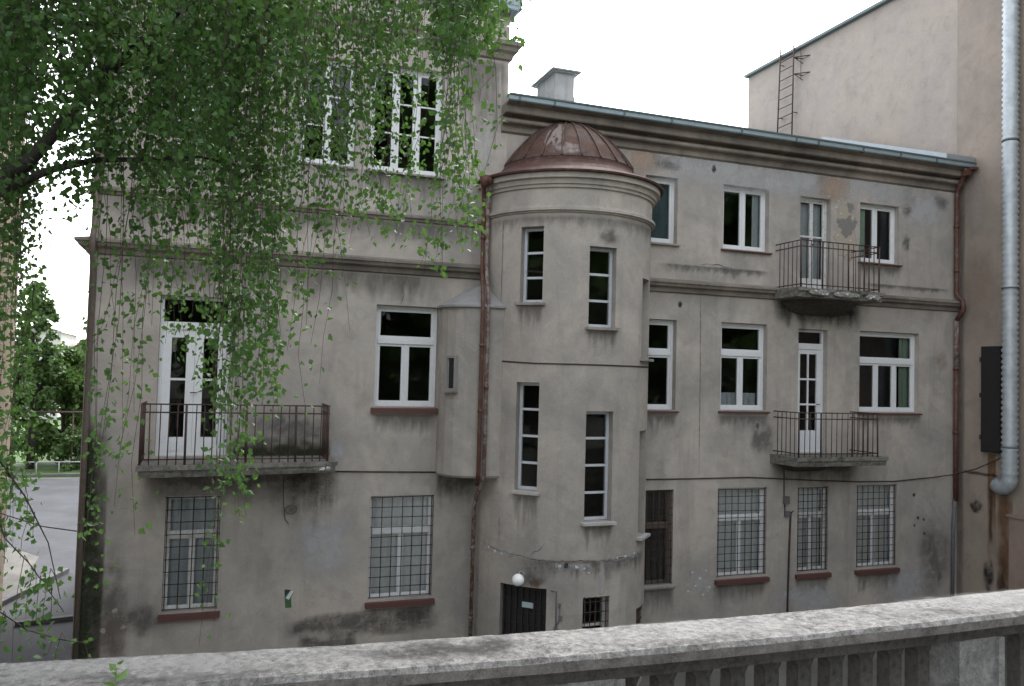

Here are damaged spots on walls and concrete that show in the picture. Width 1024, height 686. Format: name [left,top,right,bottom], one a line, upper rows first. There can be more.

flaking render [834,204,856,260]
spalling [809,289,881,301]
rust [968,455,1010,592]